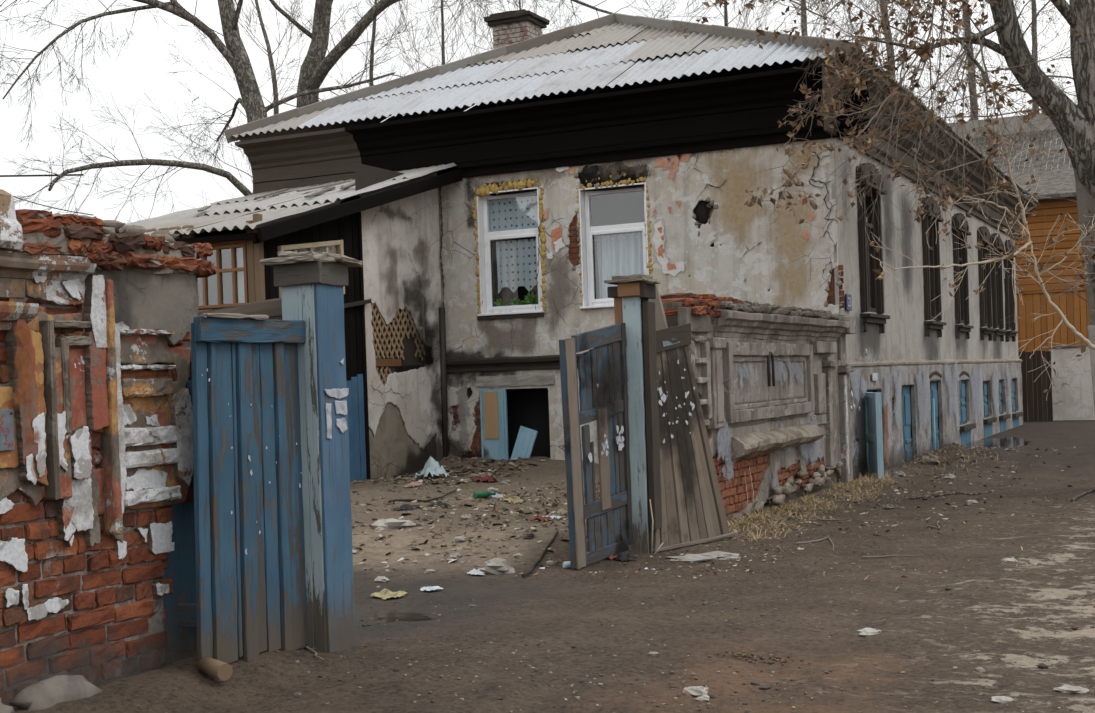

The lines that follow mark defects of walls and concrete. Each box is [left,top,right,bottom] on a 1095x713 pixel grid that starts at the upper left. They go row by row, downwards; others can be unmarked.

spalling [556,153,691,191]
spalling [542,208,580,270]
spalling [692,197,718,236]
flaking render [60,278,81,301]
leakage [388,249,398,298]
spalling [371,303,425,385]
leakage [426,304,444,430]
flaking render [0,497,14,514]
flaking render [18,411,175,560]
spalling [704,418,826,518]
flaking render [0,537,69,621]
flaking render [152,583,170,596]